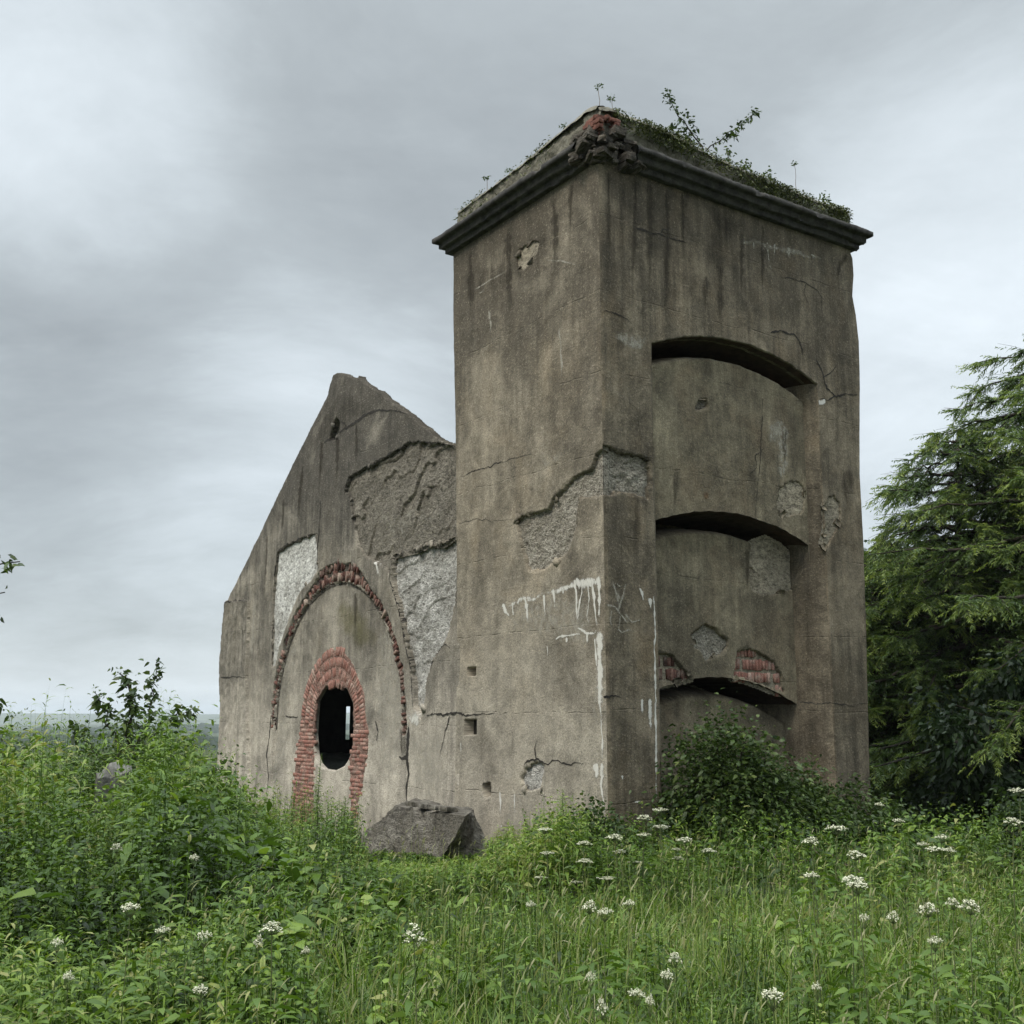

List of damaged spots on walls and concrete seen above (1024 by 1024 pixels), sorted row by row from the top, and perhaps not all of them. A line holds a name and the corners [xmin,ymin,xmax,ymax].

peeling [513,240,540,270]
crack [770,330,857,401]
spalling [513,447,647,570]
peeling [777,482,806,519]
peeling [273,535,318,667]
spalling [348,442,457,713]
peeling [748,535,791,596]
efflorescence [502,577,639,811]
efflorescence [640,588,657,798]
spalling [658,655,694,691]
spalling [691,625,784,697]
crack [524,744,583,766]